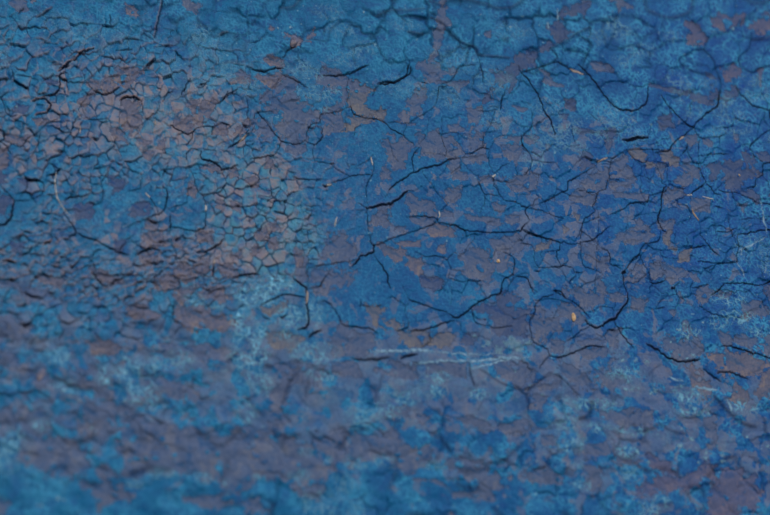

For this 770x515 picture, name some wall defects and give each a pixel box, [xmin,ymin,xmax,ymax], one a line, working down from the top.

crack [0,8,378,423]
peeling [128,199,280,333]
peeling [0,300,479,515]
crack [346,373,449,425]
peeling [444,455,563,502]
peeling [445,239,653,437]
crack [336,53,770,382]
crack [558,399,647,490]
peeling [573,415,765,515]
peeling [569,127,770,213]
crack [676,385,702,415]
peeling [616,218,770,408]